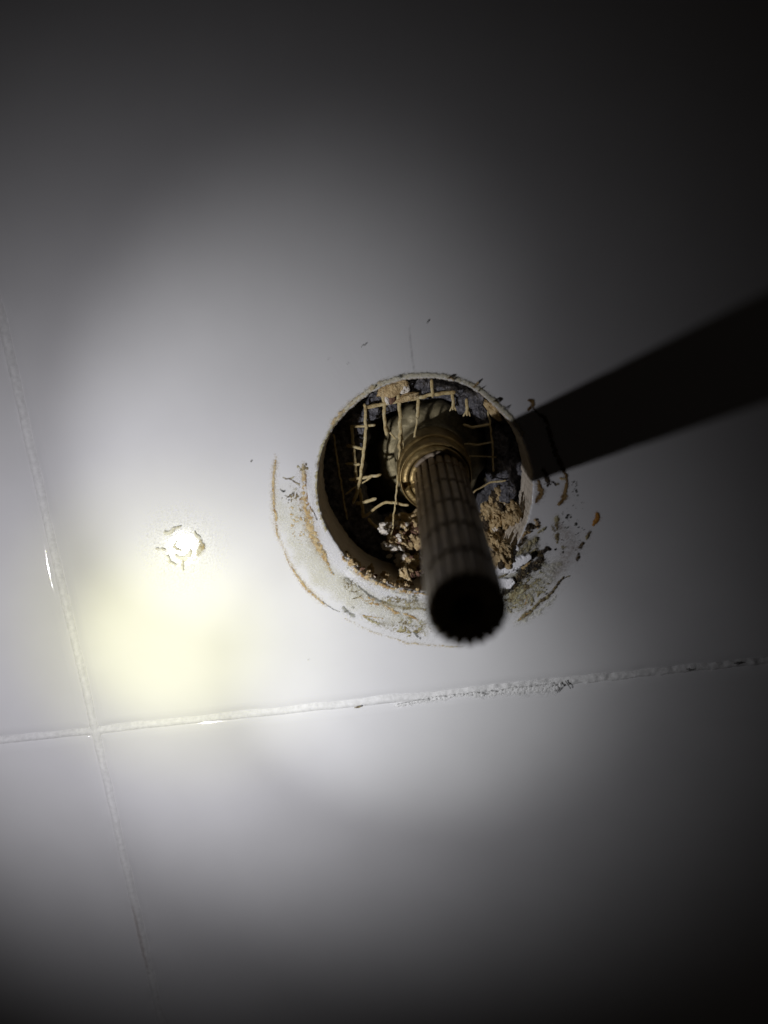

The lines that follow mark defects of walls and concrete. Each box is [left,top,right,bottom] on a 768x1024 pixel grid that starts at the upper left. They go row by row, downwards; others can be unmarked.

spalling [314,373,524,531]